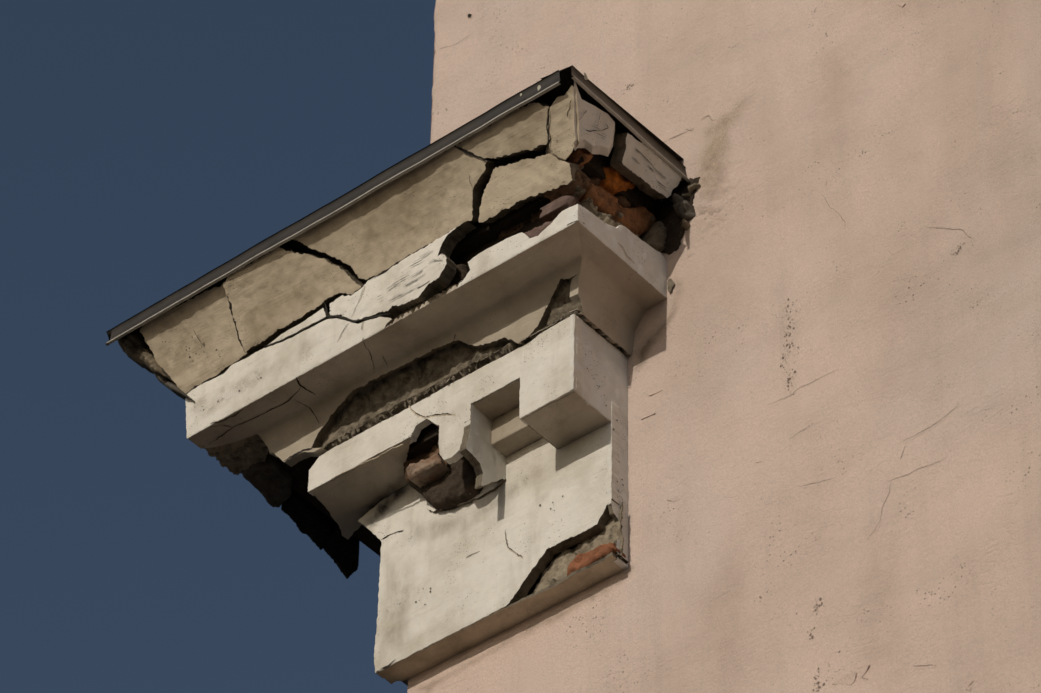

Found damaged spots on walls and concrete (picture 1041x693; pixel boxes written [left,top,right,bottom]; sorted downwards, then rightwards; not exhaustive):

crack [455,100,608,193]
flaking render [498,148,701,255]
crack [227,231,450,375]
flaking render [437,264,470,294]
crack [522,322,557,342]
flaking render [532,279,580,340]
crack [208,377,321,445]
flaking render [319,342,521,455]
crack [409,405,456,419]
flaking render [202,434,360,579]
flaking render [403,445,483,512]
flaking render [532,479,629,594]